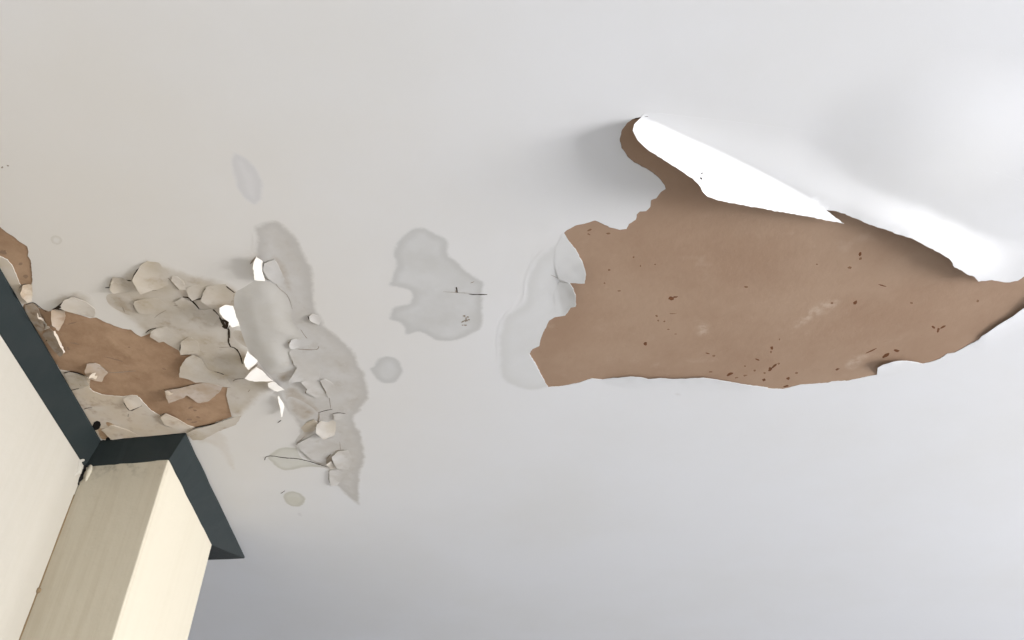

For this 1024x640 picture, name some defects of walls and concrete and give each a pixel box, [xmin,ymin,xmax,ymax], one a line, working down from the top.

peeling [0,227,352,486]
leakage [49,218,405,508]
leakage [386,225,487,343]
peeling [530,113,1024,392]